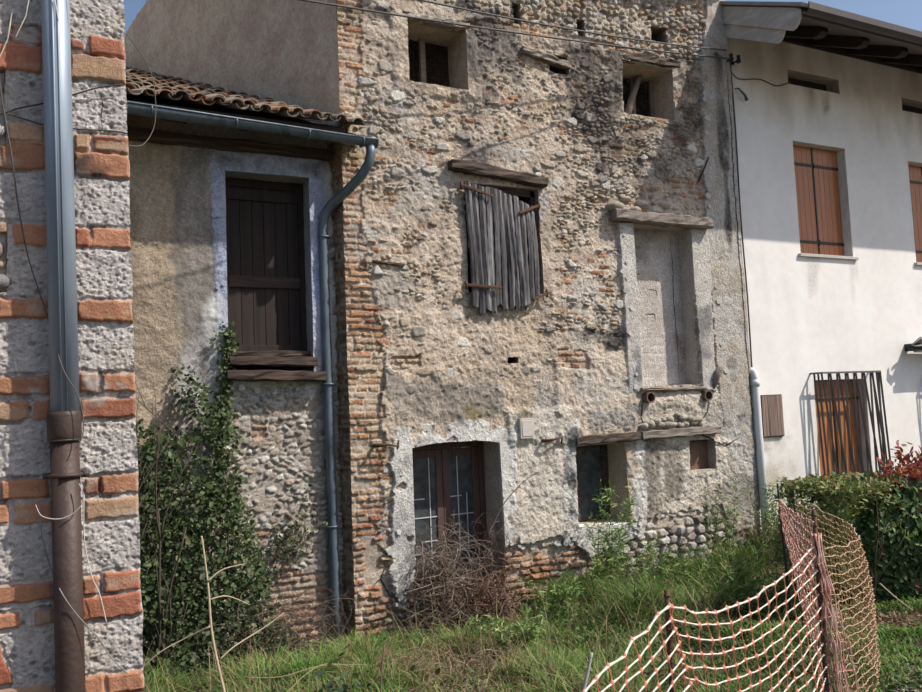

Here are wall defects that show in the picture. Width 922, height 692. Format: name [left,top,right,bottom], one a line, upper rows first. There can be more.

leakage [562,41,623,175]
leakage [718,109,729,177]
flaking render [503,504,727,610]